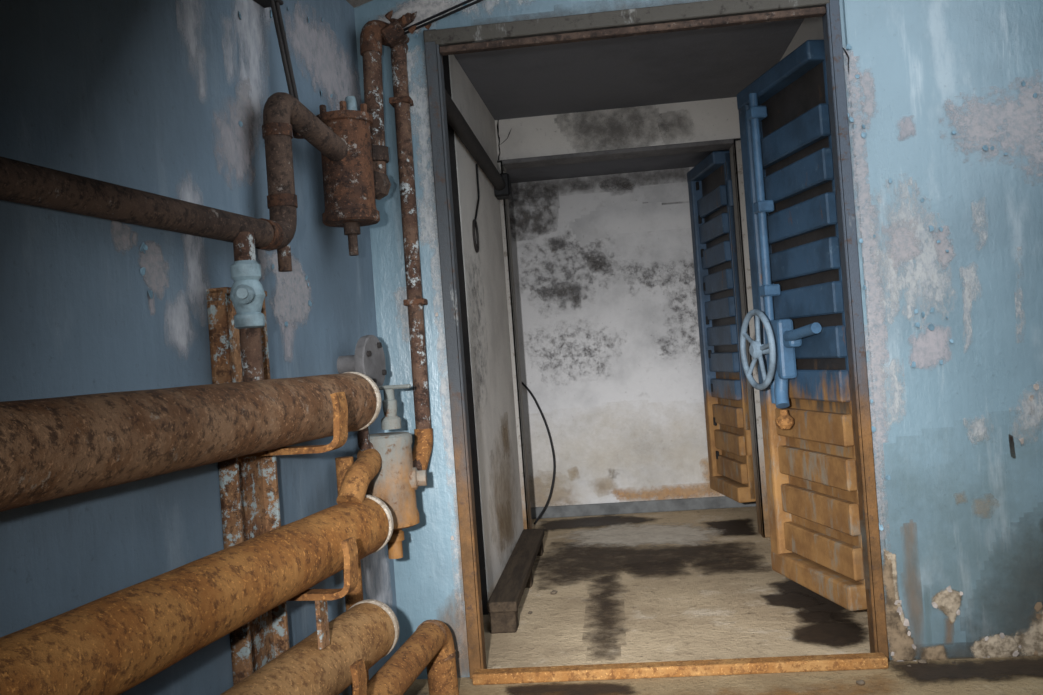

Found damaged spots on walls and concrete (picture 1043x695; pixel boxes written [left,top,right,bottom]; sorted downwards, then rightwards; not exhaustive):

peeling [112,221,169,314]
peeling [257,249,312,359]
peeling [378,0,499,514]
damp [535,333,609,369]
damp [509,171,685,307]
damp [629,263,700,346]
peeling [843,44,979,662]
flaking render [1009,384,1043,458]
peeling [451,527,467,657]
damp [534,515,765,657]
damp [761,579,867,648]
flaking render [971,602,1043,658]